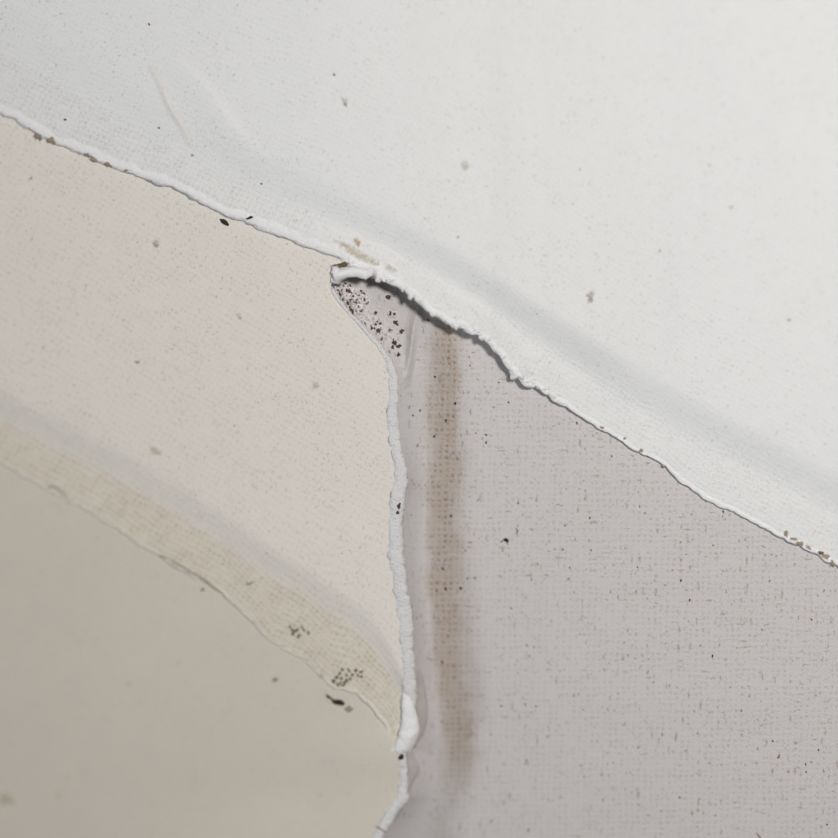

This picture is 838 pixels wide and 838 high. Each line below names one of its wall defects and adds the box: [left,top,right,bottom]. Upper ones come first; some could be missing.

spalling [331,266,405,357]
peeling [331,668,364,687]
peeling [406,749,419,796]